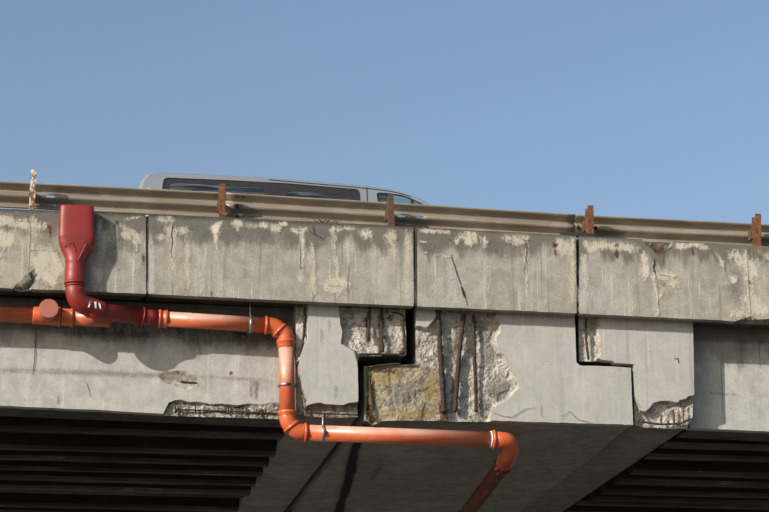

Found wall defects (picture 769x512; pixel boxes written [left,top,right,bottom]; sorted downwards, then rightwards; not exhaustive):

water stain [0,215,65,289]
water stain [120,216,145,251]
water stain [209,219,373,297]
water stain [384,229,488,300]
crack [449,239,467,305]
water stain [556,238,680,315]
water stain [676,243,708,251]
water stain [718,250,769,319]
spalling [158,370,204,390]
spalling [163,400,279,419]
spalling [296,305,519,425]
spalling [634,395,694,429]